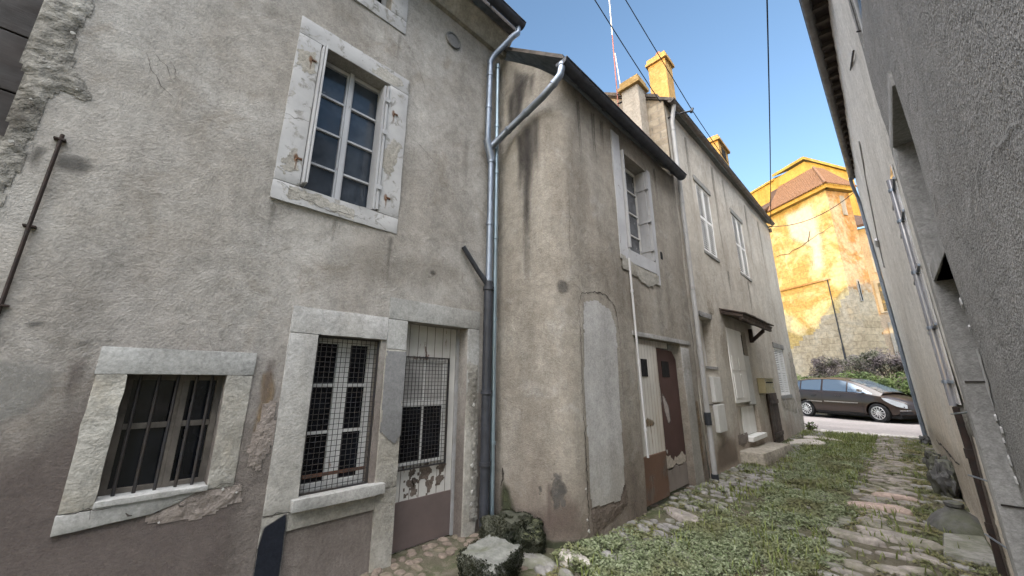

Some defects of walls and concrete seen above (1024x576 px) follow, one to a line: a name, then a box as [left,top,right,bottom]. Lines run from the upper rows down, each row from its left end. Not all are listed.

spalling [0,0,95,207]
spalling [246,372,277,471]
peeling [403,462,446,499]
peeling [666,450,686,470]
spalling [145,483,243,524]